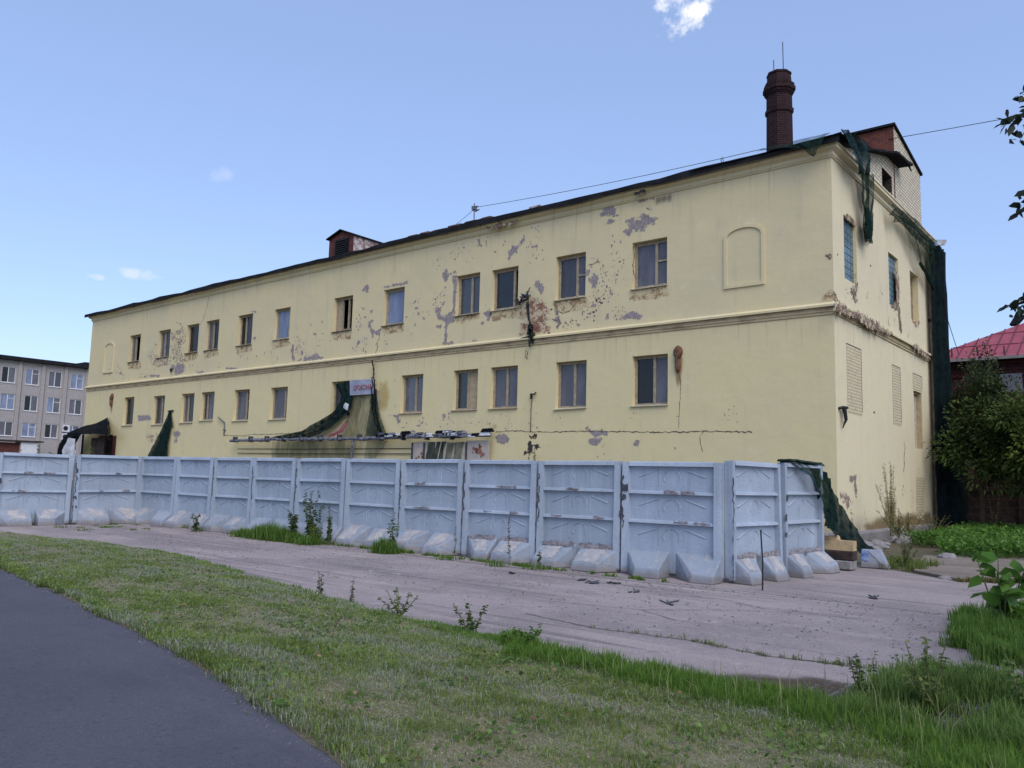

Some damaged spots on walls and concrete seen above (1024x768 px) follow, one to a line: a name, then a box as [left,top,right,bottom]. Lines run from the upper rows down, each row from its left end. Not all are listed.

flaking render [477,219,538,260]
peeling [599,189,659,236]
flaking render [310,269,669,347]
flaking render [821,268,920,336]
flaking render [119,322,219,378]
peeling [585,426,608,446]
crack [497,373,752,451]
peeling [840,475,857,510]